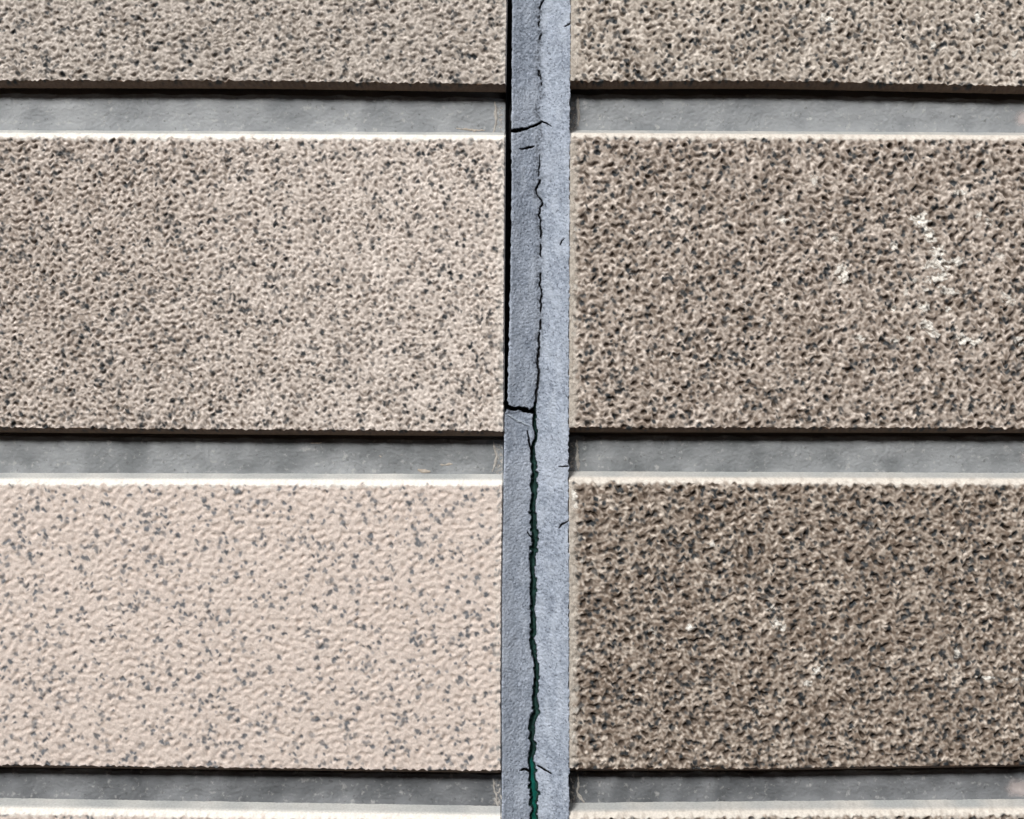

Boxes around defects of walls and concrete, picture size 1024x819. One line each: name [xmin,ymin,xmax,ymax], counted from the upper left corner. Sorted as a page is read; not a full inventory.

crack [504,121,568,819]